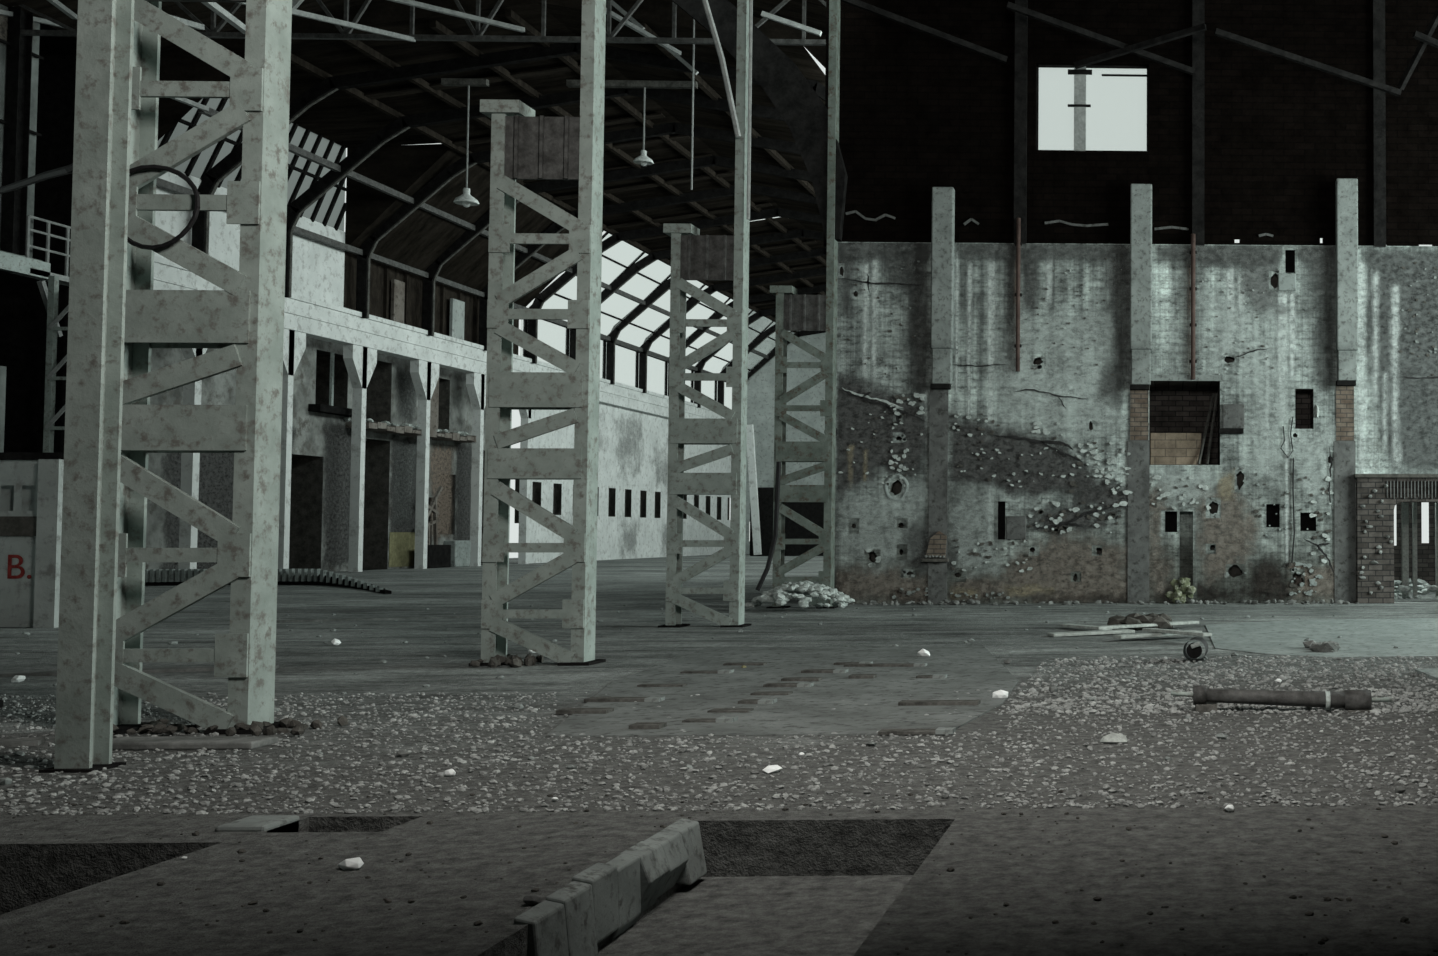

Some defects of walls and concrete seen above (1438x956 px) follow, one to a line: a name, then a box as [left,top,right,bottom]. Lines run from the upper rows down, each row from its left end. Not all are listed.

spalling [838,393,926,495]
damp [956,251,1052,428]
damp [1358,246,1438,471]
spalling [865,547,881,567]